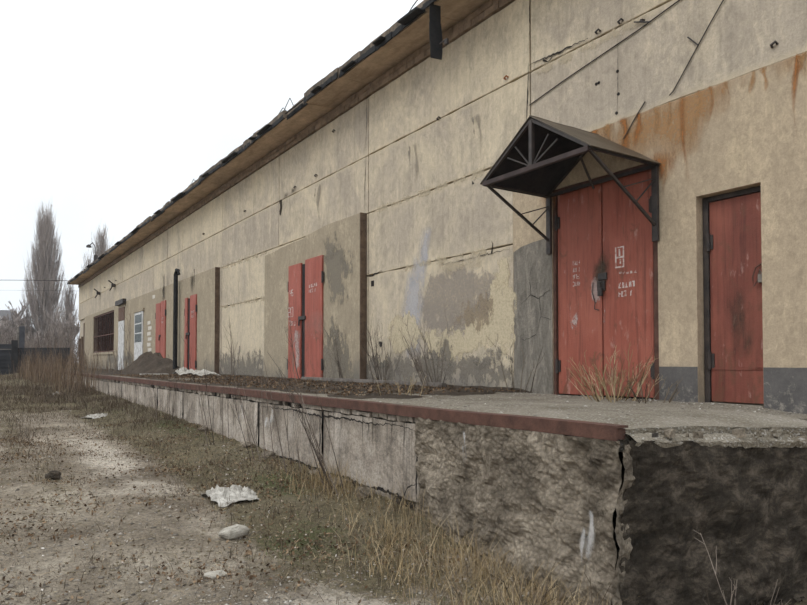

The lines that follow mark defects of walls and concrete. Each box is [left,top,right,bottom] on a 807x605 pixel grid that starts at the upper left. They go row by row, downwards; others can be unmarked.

rust [793,53,805,93]
rust [592,83,727,156]